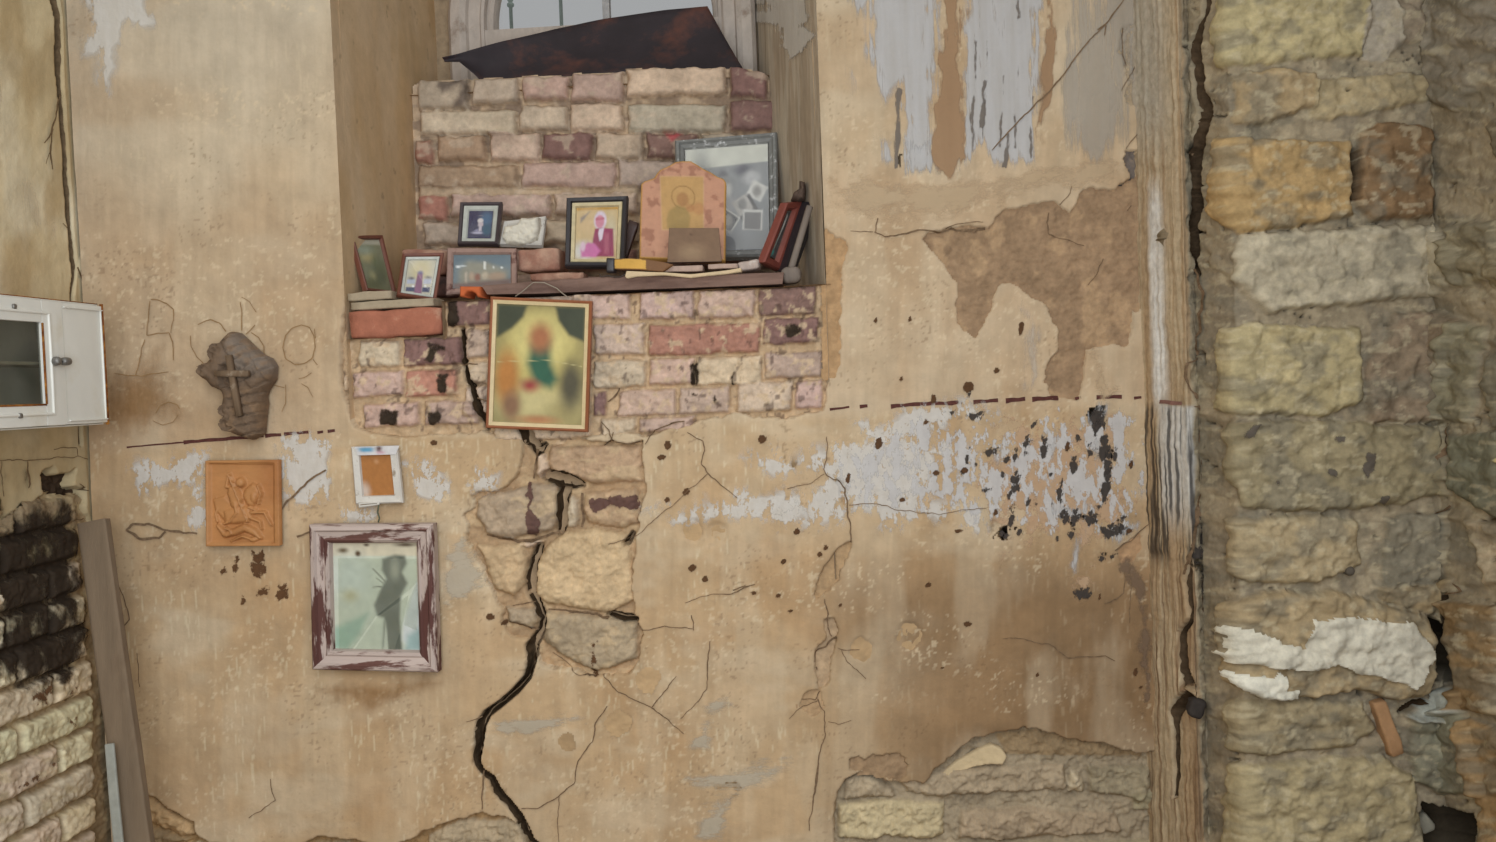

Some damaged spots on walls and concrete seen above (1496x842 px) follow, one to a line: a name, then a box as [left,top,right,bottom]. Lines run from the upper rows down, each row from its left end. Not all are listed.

crack [44,0,82,301]
peeling [923,151,1140,400]
crack [1046,186,1103,285]
crack [1171,0,1214,796]
peeling [987,414,1142,563]
flaking render [0,472,112,842]
crack [461,329,755,842]
peeling [850,753,907,783]
peeling [943,742,1007,775]
crack [1104,523,1150,623]
crack [1398,698,1429,711]
crack [1440,583,1462,624]